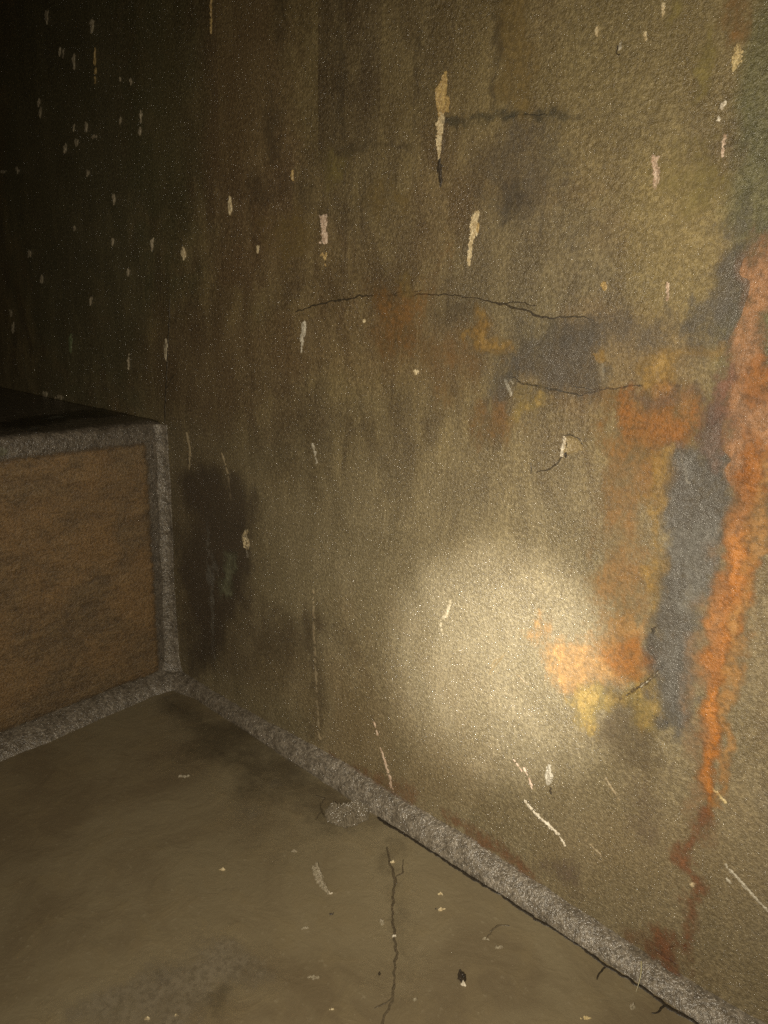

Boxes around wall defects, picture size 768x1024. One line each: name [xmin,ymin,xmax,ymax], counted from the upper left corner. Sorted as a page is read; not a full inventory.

peeling [435,71,450,187]
peeling [467,210,480,266]
crack [295,290,592,320]
crack [508,376,683,397]
damp [182,470,249,658]
damp [645,408,730,735]
corrosion [697,239,768,825]
corrosion [549,616,665,735]
crack [374,817,699,1024]